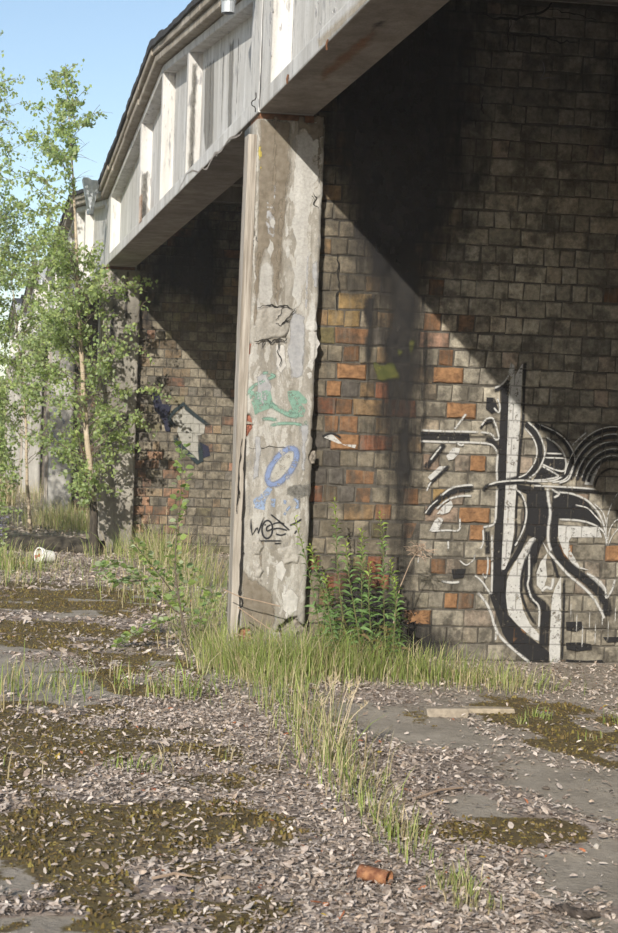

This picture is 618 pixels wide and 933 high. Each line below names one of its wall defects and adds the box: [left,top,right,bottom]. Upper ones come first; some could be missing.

peeling [252,240,274,327]
crack [255,304,296,366]
peeling [285,131,320,379]
damp [337,238,449,660]